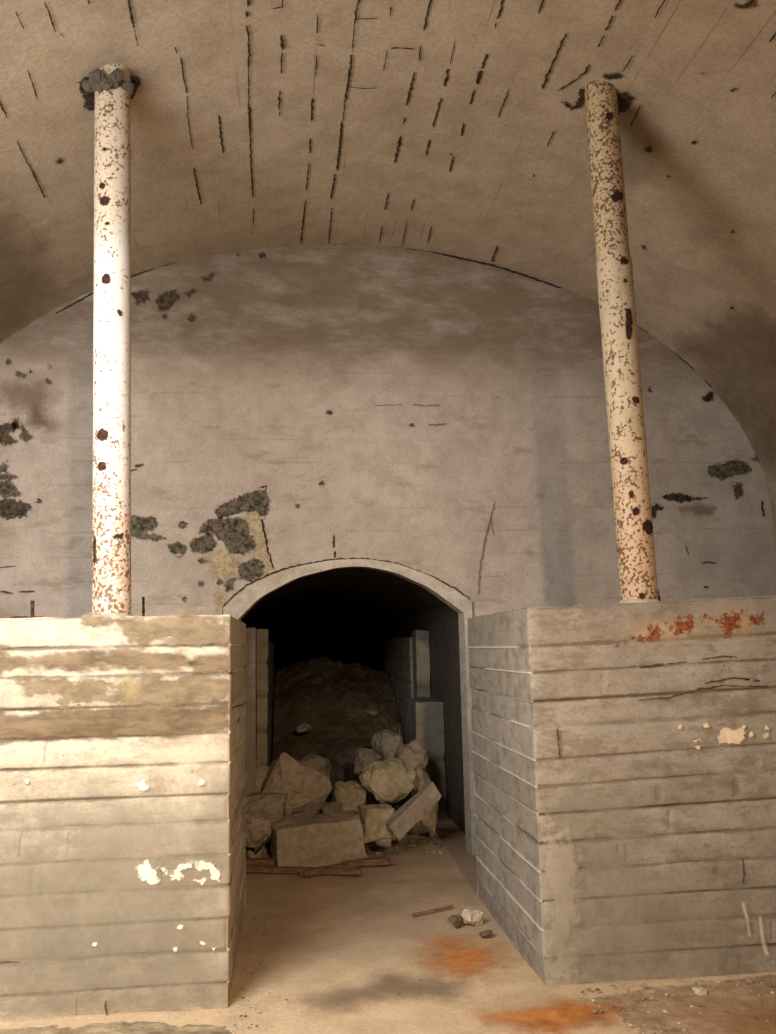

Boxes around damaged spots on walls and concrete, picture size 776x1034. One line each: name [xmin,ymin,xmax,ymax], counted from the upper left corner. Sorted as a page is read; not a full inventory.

spalling [77,67,141,111]
crack [245,0,283,226]
crack [300,0,432,245]
crack [426,41,488,172]
crack [542,0,622,91]
spalling [0,419,31,446]
spalling [0,460,42,520]
spalling [707,455,760,500]
spalling [131,490,273,610]
crack [222,504,495,617]
corrosion [608,609,765,648]
peeling [694,722,769,750]